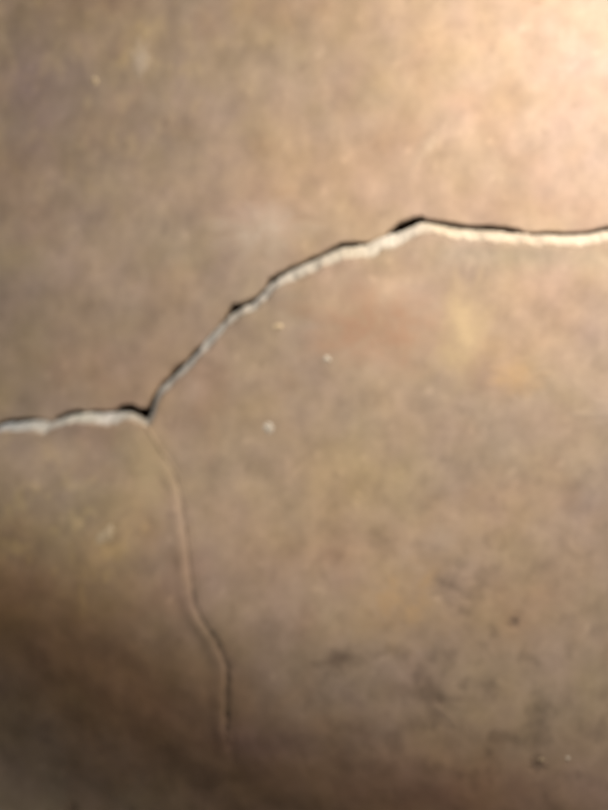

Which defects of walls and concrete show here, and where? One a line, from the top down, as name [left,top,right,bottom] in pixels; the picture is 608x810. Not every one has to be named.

crack [0,217,608,744]